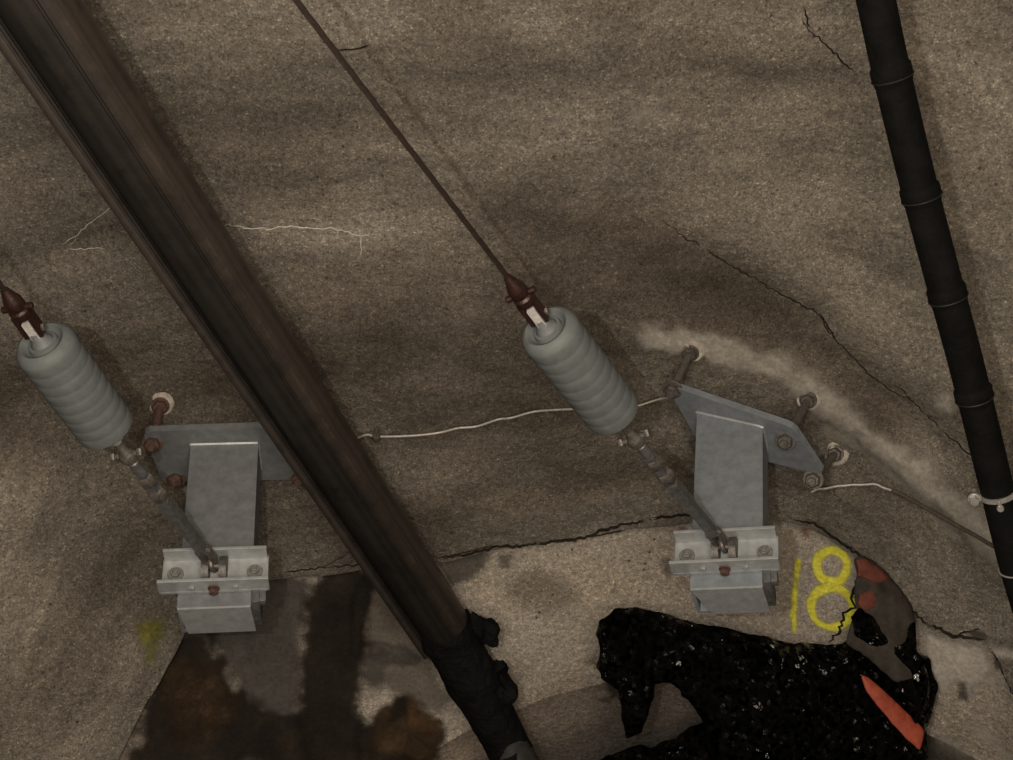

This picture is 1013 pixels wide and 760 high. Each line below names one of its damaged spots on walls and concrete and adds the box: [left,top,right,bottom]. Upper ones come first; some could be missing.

crack [802,8,855,73]
crack [666,223,971,455]
damp [640,326,997,562]
crack [286,555,358,572]
crack [437,513,690,559]
crack [793,519,861,556]
crack [828,581,857,643]
rust [370,696,445,760]